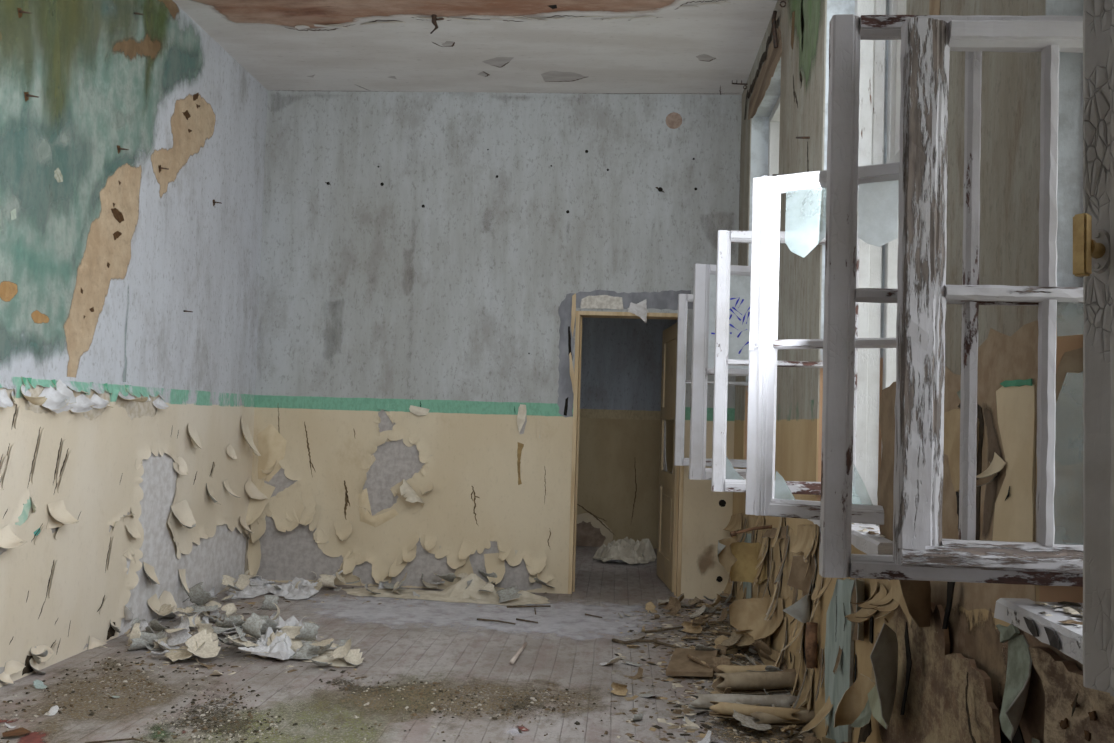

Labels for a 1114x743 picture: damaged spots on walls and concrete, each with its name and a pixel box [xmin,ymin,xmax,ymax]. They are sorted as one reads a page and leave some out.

peeling [285,5,557,31]
damp [193,0,675,29]
spalling [478,57,514,77]
spalling [541,71,588,82]
damp [788,0,821,87]
damp [0,0,203,363]
peeling [0,93,555,650]
crack [0,405,72,664]
crack [97,537,115,614]
peeling [877,382,896,541]
peeling [718,513,1114,743]
spalling [942,366,961,540]